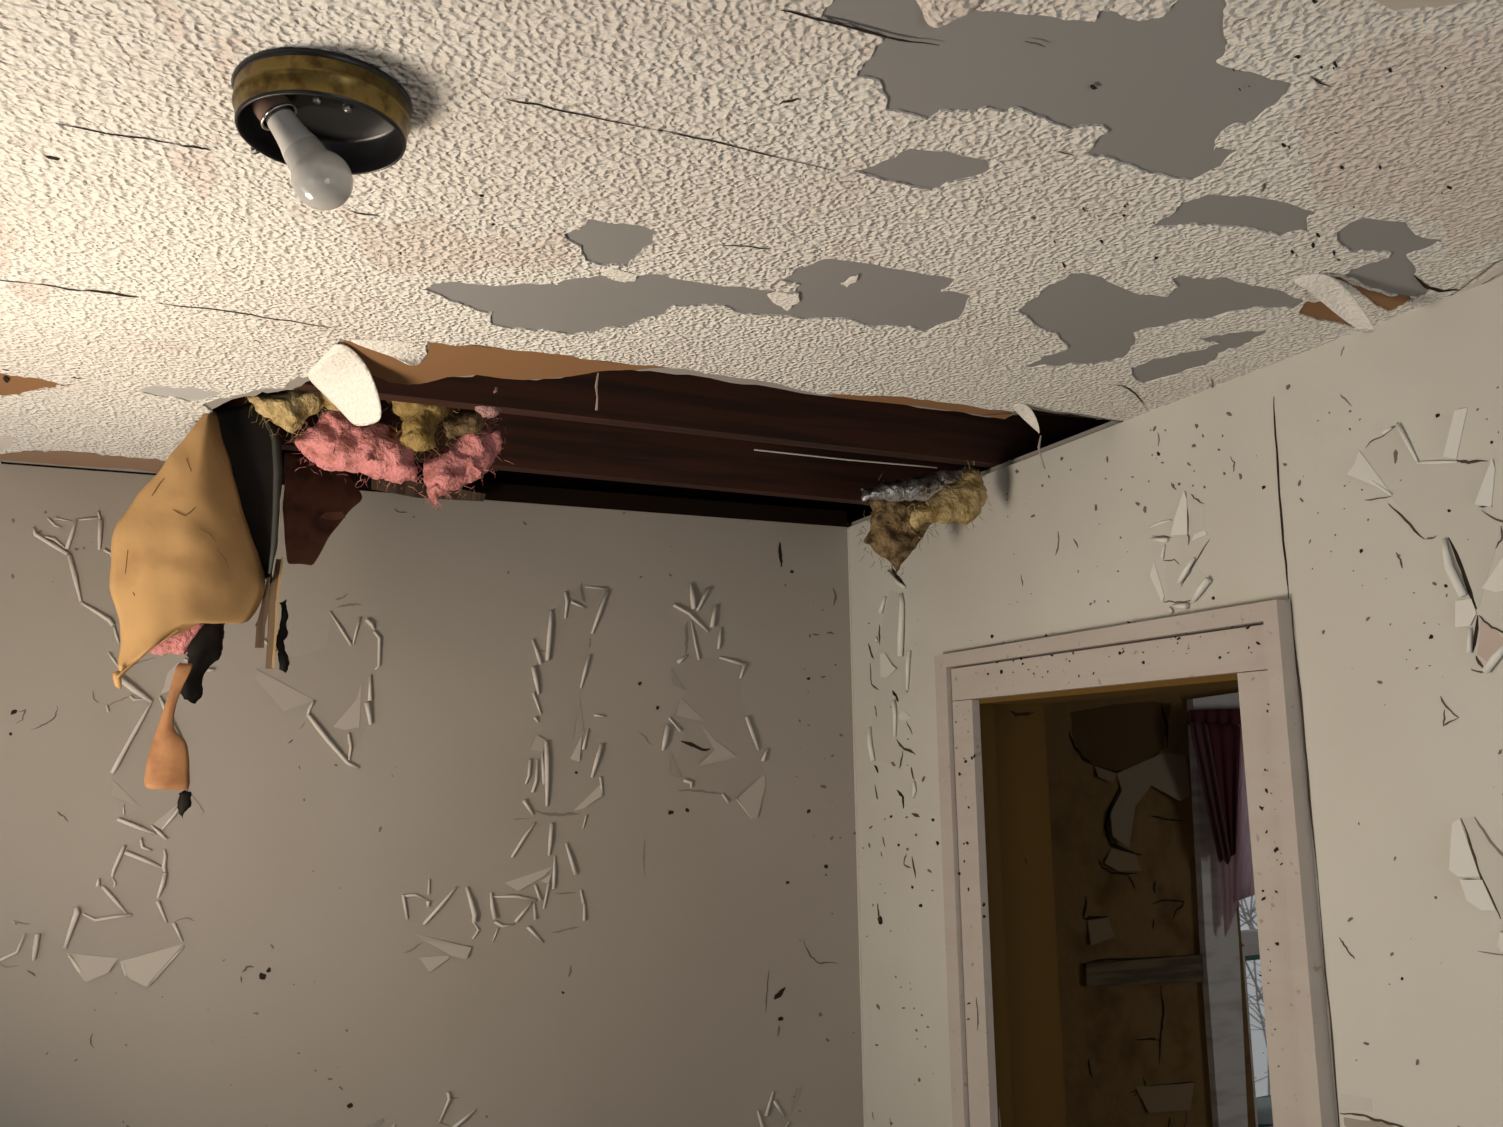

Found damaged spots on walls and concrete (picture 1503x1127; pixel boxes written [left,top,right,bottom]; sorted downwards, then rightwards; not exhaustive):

peeling [821,0,1291,179]
peeling [1154,195,1315,234]
crack [0,280,331,345]
peeling [426,219,971,333]
peeling [1018,218,1440,382]
peeling [308,339,428,426]
crack [1457,458,1485,466]
crack [1155,482,1210,603]
peeling [1347,407,1503,662]
crack [1367,496,1503,673]
crack [1273,398,1404,1127]
crack [1461,819,1503,932]